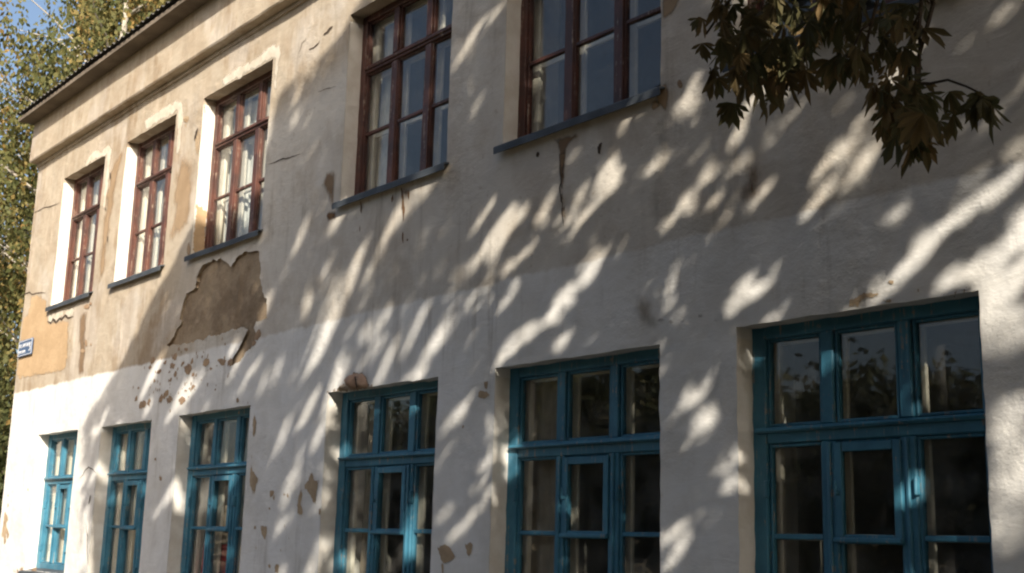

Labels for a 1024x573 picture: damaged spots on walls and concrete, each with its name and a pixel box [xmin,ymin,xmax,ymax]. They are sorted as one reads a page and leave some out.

corrosion [557,135,576,211]
spalling [133,160,269,412]
peeling [250,455,258,494]
peeling [269,473,321,515]
peeling [438,542,472,573]